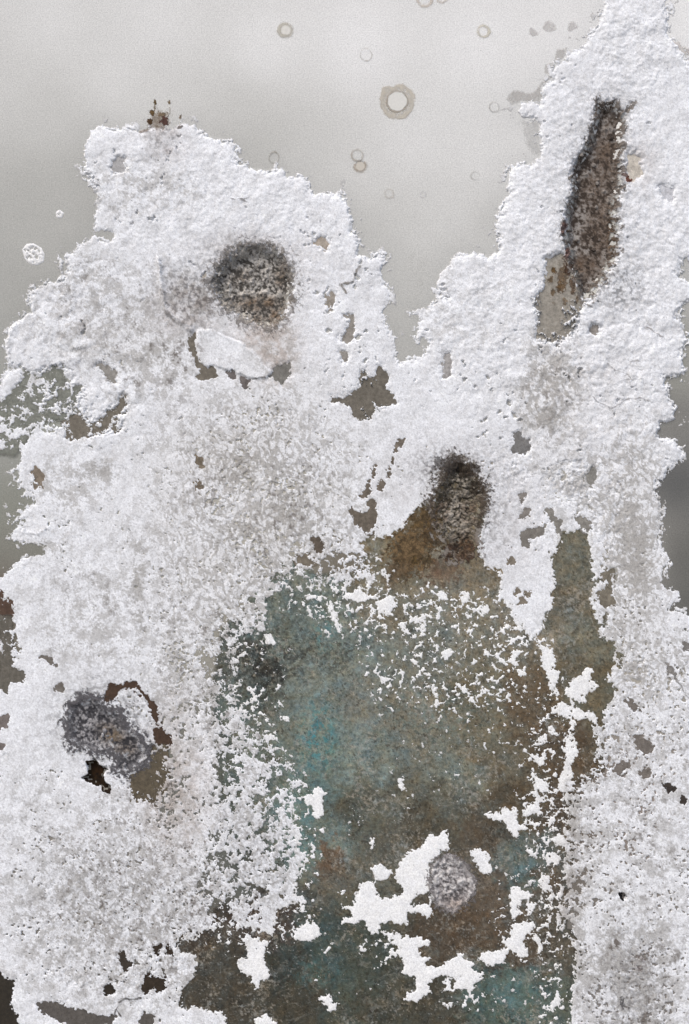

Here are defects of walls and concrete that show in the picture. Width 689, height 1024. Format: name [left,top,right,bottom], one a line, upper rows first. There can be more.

corrosion [141,99,183,133]
damp [0,112,398,1024]
corrosion [381,506,480,586]
damp [323,0,689,1024]